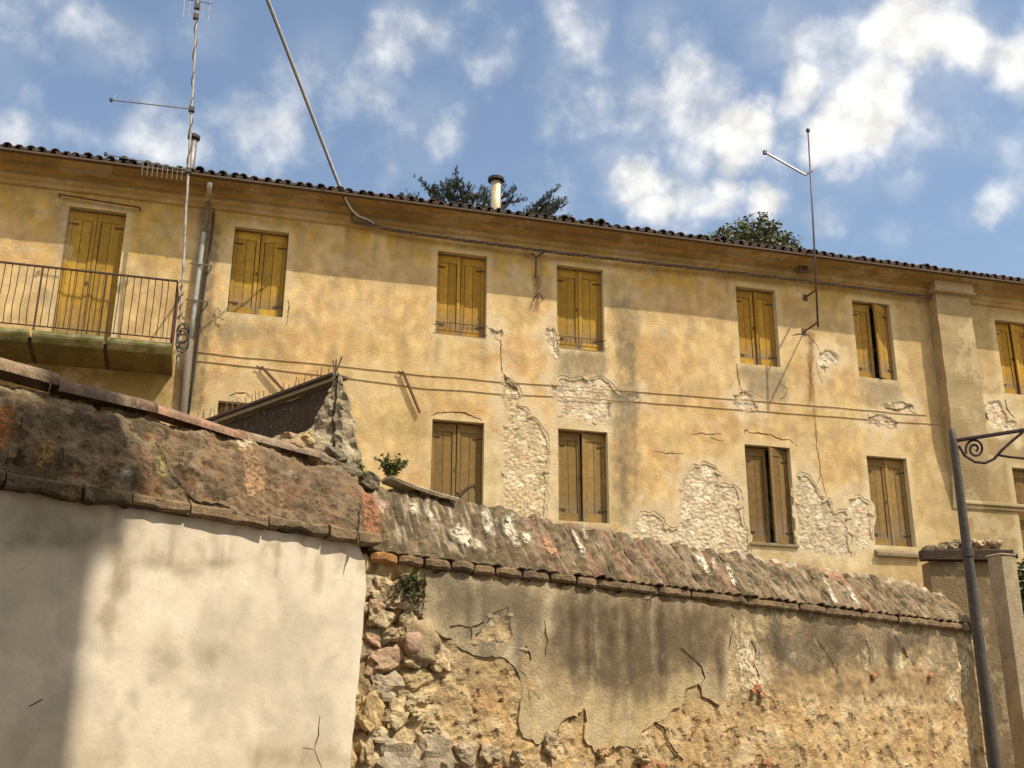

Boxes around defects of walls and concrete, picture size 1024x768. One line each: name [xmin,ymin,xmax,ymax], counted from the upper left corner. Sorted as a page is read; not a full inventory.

flaking render [550,375,641,427]
flaking render [867,401,917,429]
flaking render [984,400,1016,432]
flaking render [451,372,557,555]
crack [744,423,830,504]
flaking render [629,461,753,585]
flaking render [790,472,876,603]
flaking render [355,576,527,768]
crack [450,622,483,640]
damp [554,596,713,690]
crack [680,648,705,690]
crack [654,722,683,761]